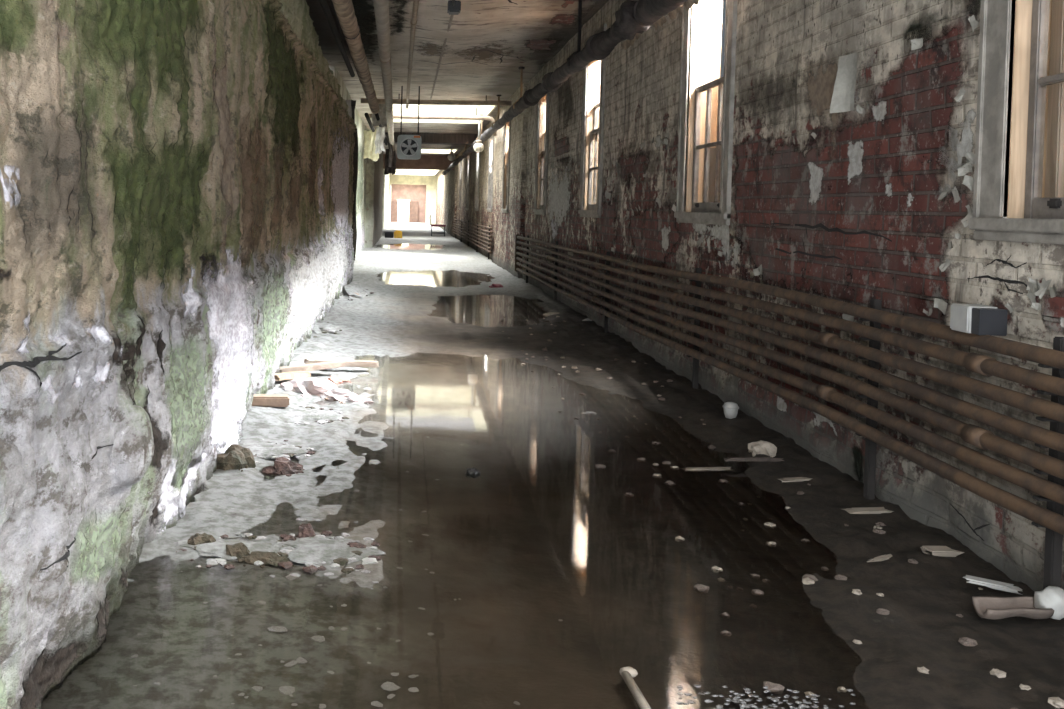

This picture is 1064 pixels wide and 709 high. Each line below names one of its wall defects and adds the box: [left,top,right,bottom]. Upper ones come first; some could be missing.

damp [170,64,190,138]
damp [0,166,21,209]
peeling [615,141,650,186]
peeling [692,0,980,338]
damp [288,128,365,343]
damp [122,248,137,310]
crack [967,255,1027,294]
damp [89,327,110,342]
crack [0,343,82,387]
damp [42,376,58,403]
damp [95,363,110,382]
damp [157,227,255,522]